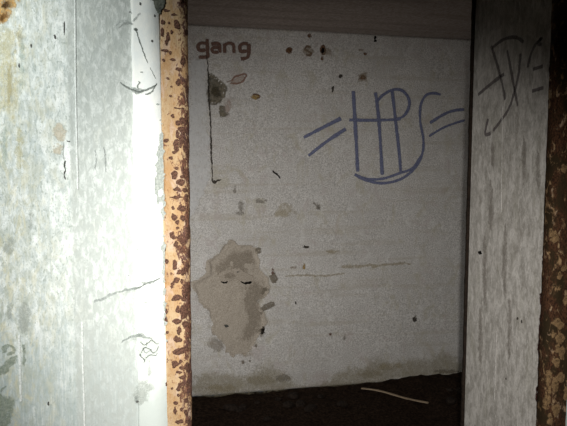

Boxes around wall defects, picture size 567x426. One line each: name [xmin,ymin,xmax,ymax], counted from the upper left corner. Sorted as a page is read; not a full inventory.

crack [120,28,157,95]
rust [161,9,188,71]
rust [164,107,189,160]
crack [119,277,162,293]
rust [164,167,191,425]